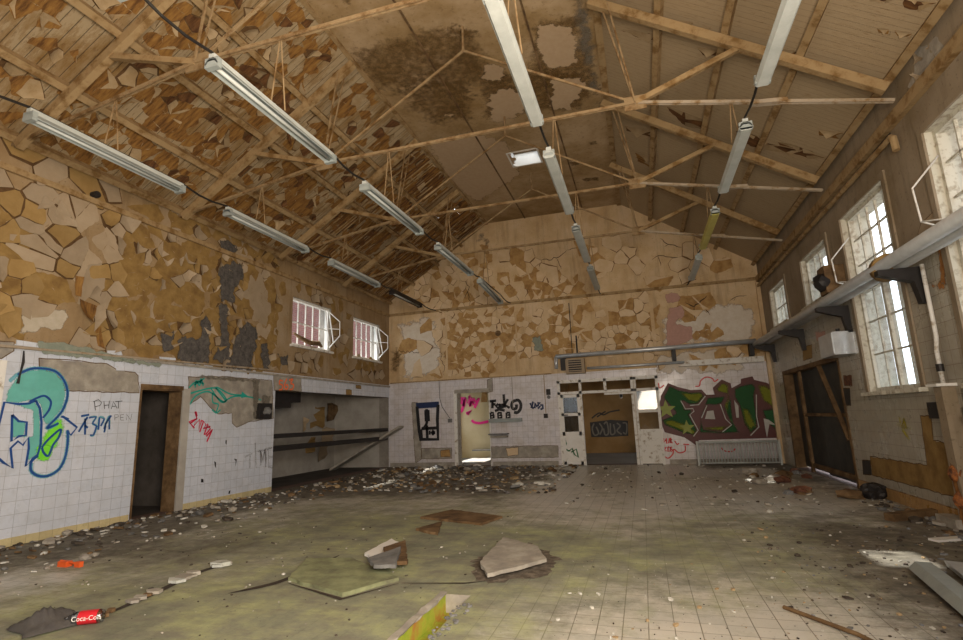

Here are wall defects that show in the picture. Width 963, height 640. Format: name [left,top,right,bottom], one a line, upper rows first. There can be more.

peeling [903,0,937,11]
water stain [357,28,518,123]
water stain [528,0,599,109]
peeling [747,134,826,159]
peeling [0,0,760,428]
water stain [38,341,161,367]
water stain [160,240,288,419]
peeling [862,415,955,497]